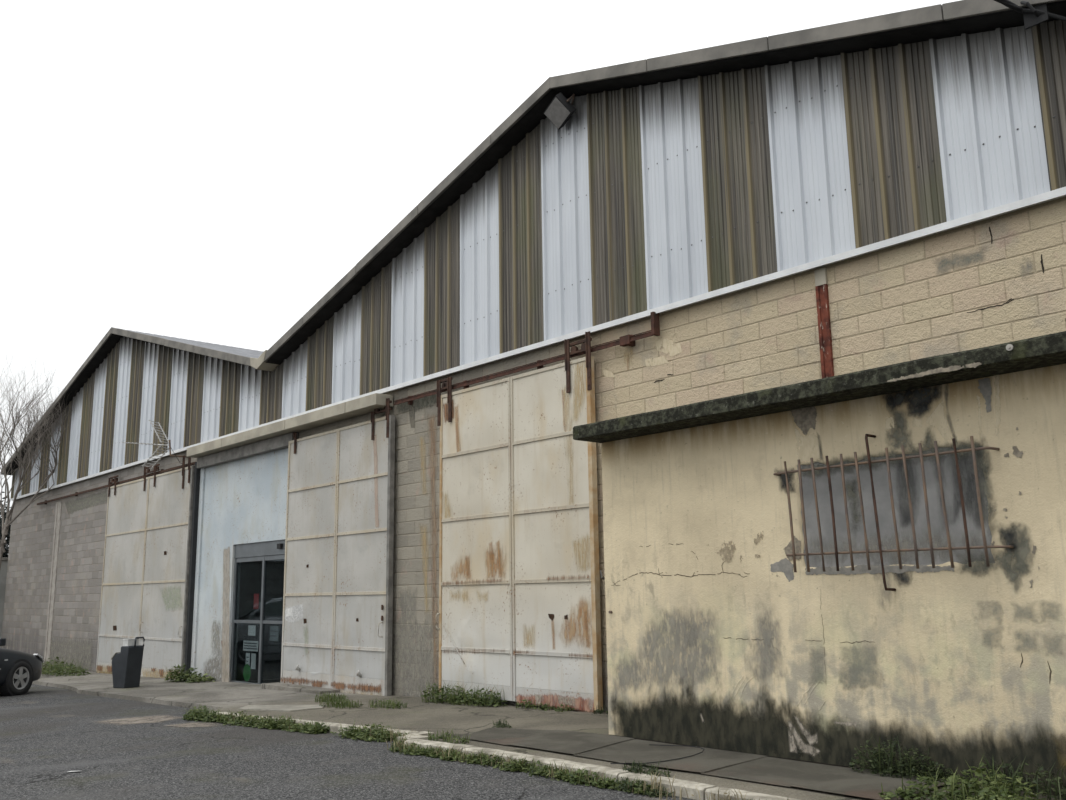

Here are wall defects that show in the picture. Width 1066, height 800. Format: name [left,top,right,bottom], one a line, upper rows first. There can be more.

water stain [778,375,1001,524]
rust [421,400,503,681]
crack [611,544,750,586]
water stain [962,525,1040,590]
rust [552,602,592,657]
rust [515,694,594,712]